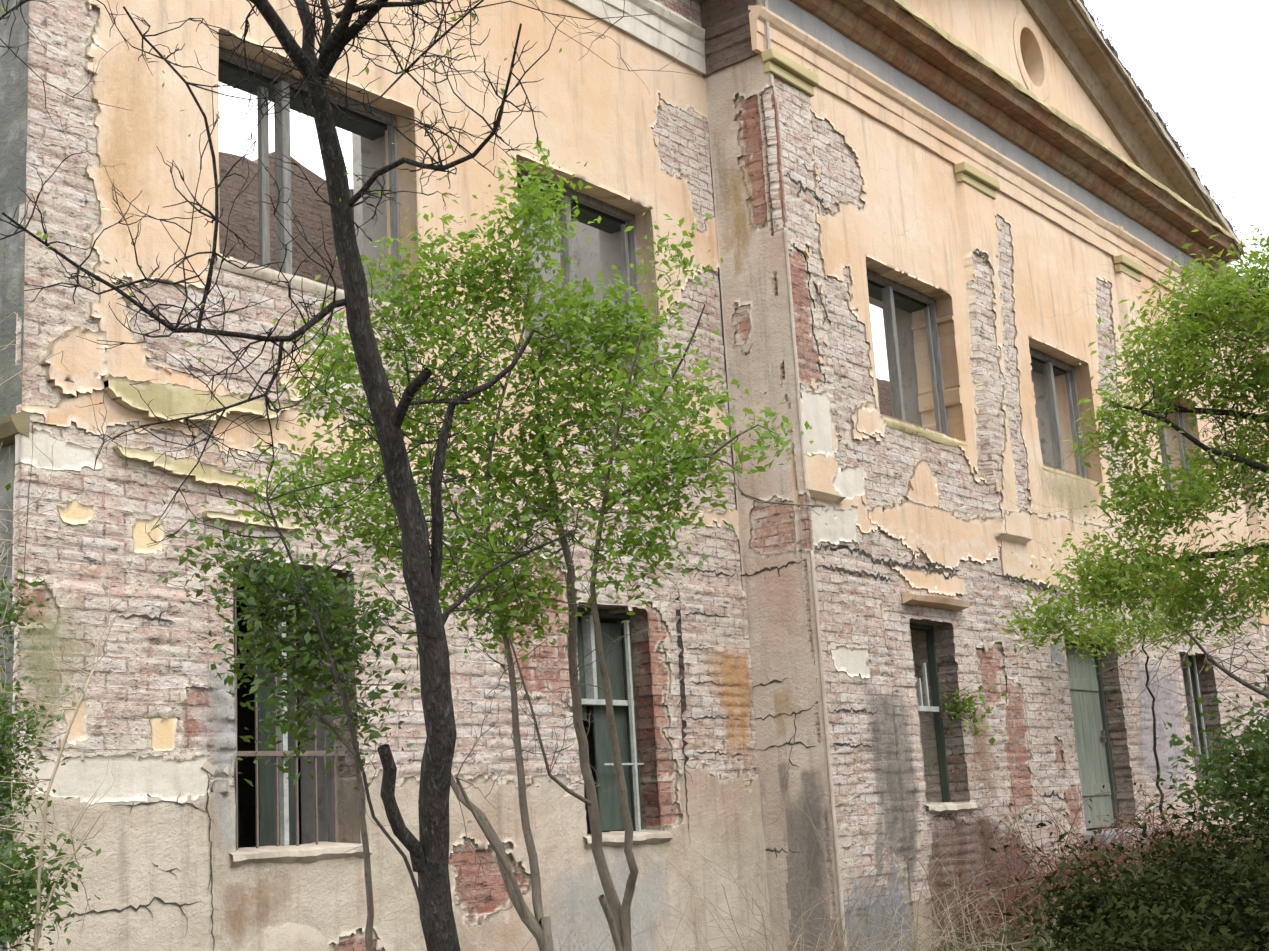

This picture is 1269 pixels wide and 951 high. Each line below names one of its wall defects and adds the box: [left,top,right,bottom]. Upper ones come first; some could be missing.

spalling [734,77,1033,520]